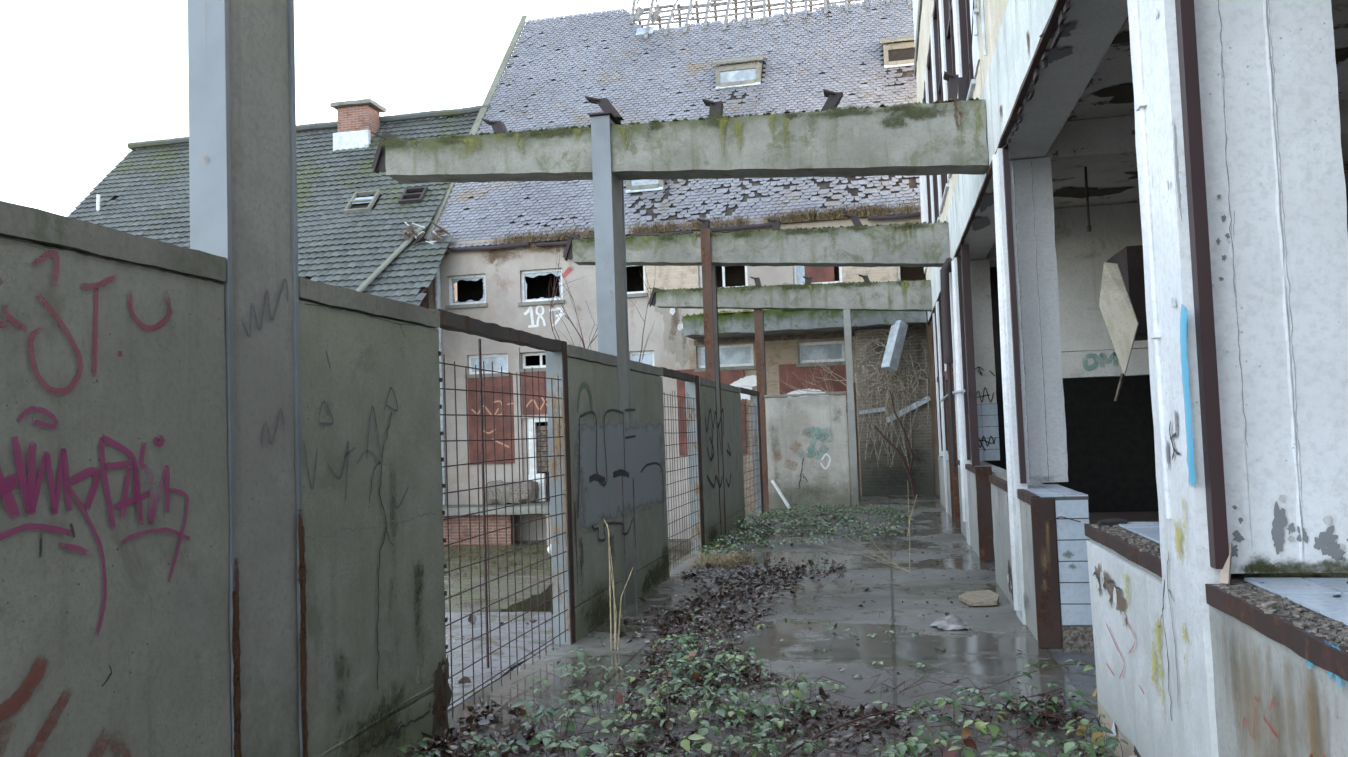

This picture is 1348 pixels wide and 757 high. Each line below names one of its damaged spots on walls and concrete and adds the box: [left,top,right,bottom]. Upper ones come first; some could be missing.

peeling [1271,495,1348,561]
corrosion [232,558,242,757]